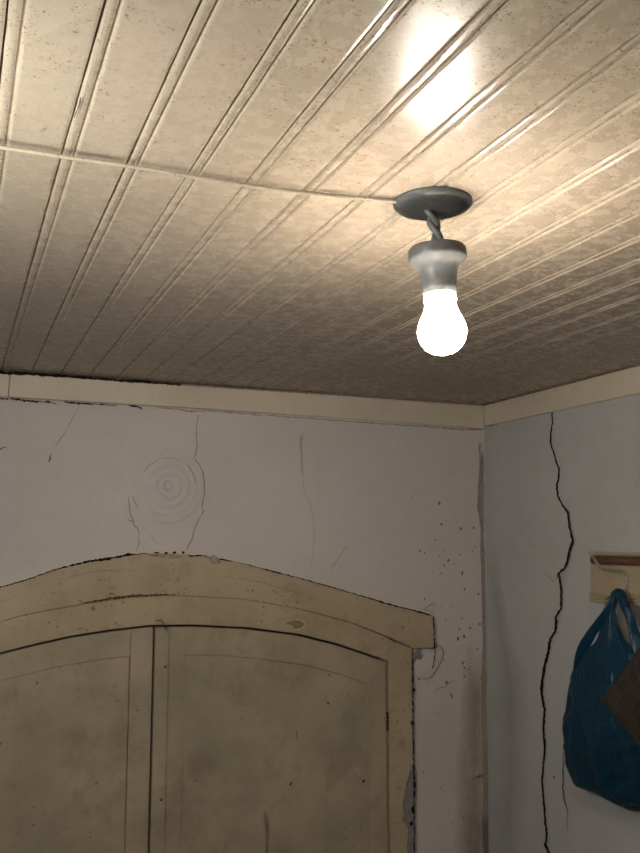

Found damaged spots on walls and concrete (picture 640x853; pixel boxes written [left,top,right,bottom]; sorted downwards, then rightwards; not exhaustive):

crack [0,398,497,650]
crack [410,654,454,852]
crack [540,412,574,853]